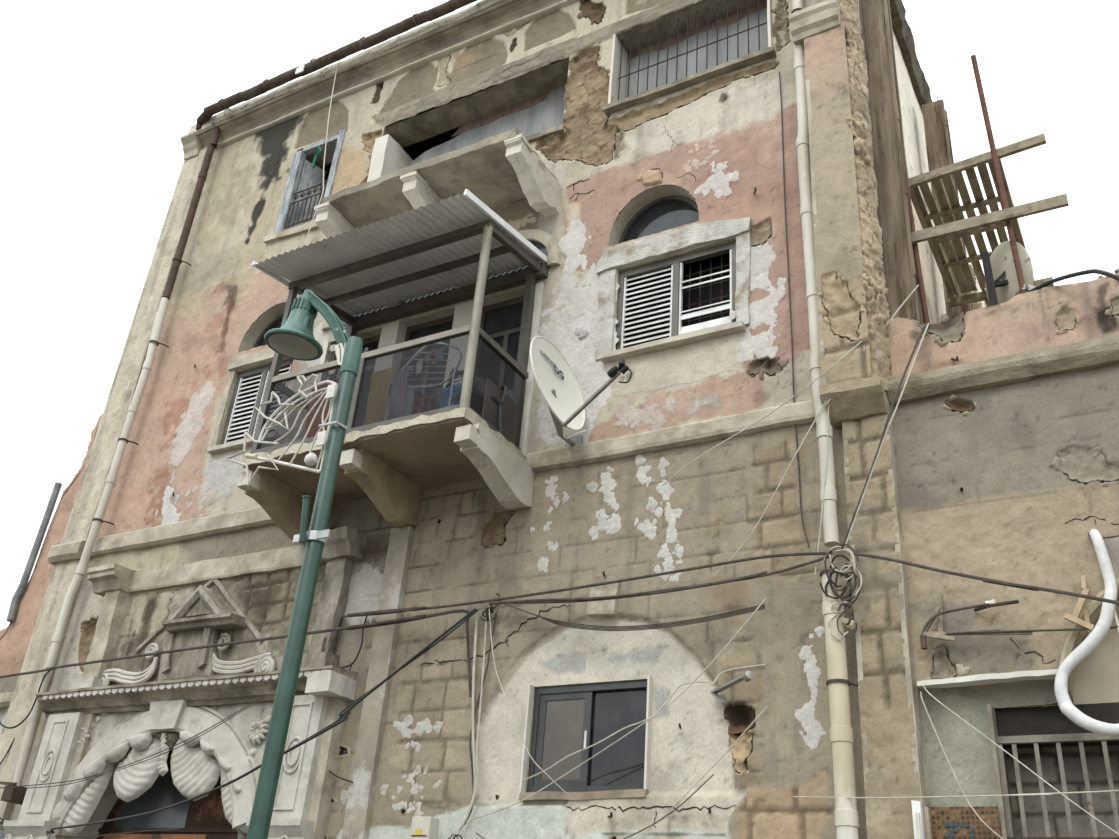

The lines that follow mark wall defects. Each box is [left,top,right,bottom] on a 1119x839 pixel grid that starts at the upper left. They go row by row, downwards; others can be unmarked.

flaking render [535,0,789,165]
damp [245,113,304,244]
peeling [683,136,739,198]
flaking render [837,0,892,392]
peeling [536,216,789,446]
peeling [155,381,251,525]
peeling [530,476,569,573]
peeling [586,454,684,582]
crack [1065,516,1119,539]
peeling [380,714,443,817]
flaking render [724,702,754,775]
peeling [795,626,826,749]